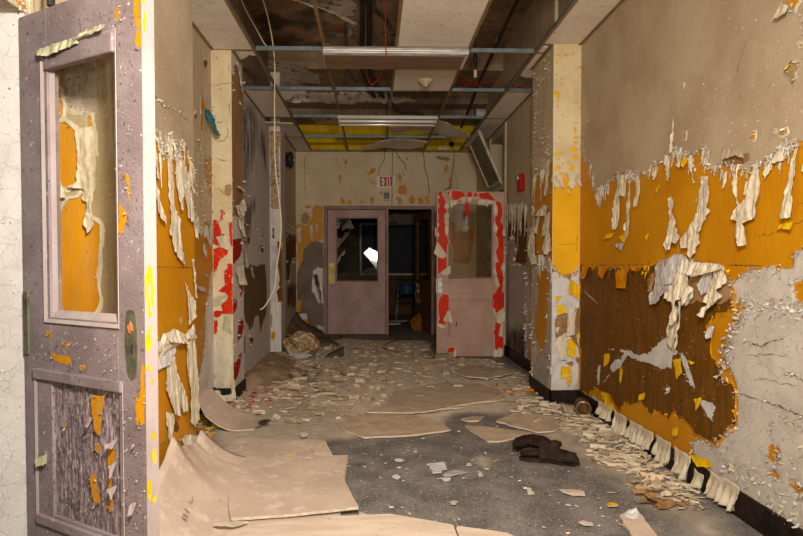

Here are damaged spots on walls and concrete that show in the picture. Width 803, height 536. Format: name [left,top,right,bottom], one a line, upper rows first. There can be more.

flaking render [245,0,357,47]
peeling [772,0,803,107]
crack [155,96,191,132]
peeling [35,52,324,533]
peeling [340,50,803,529]